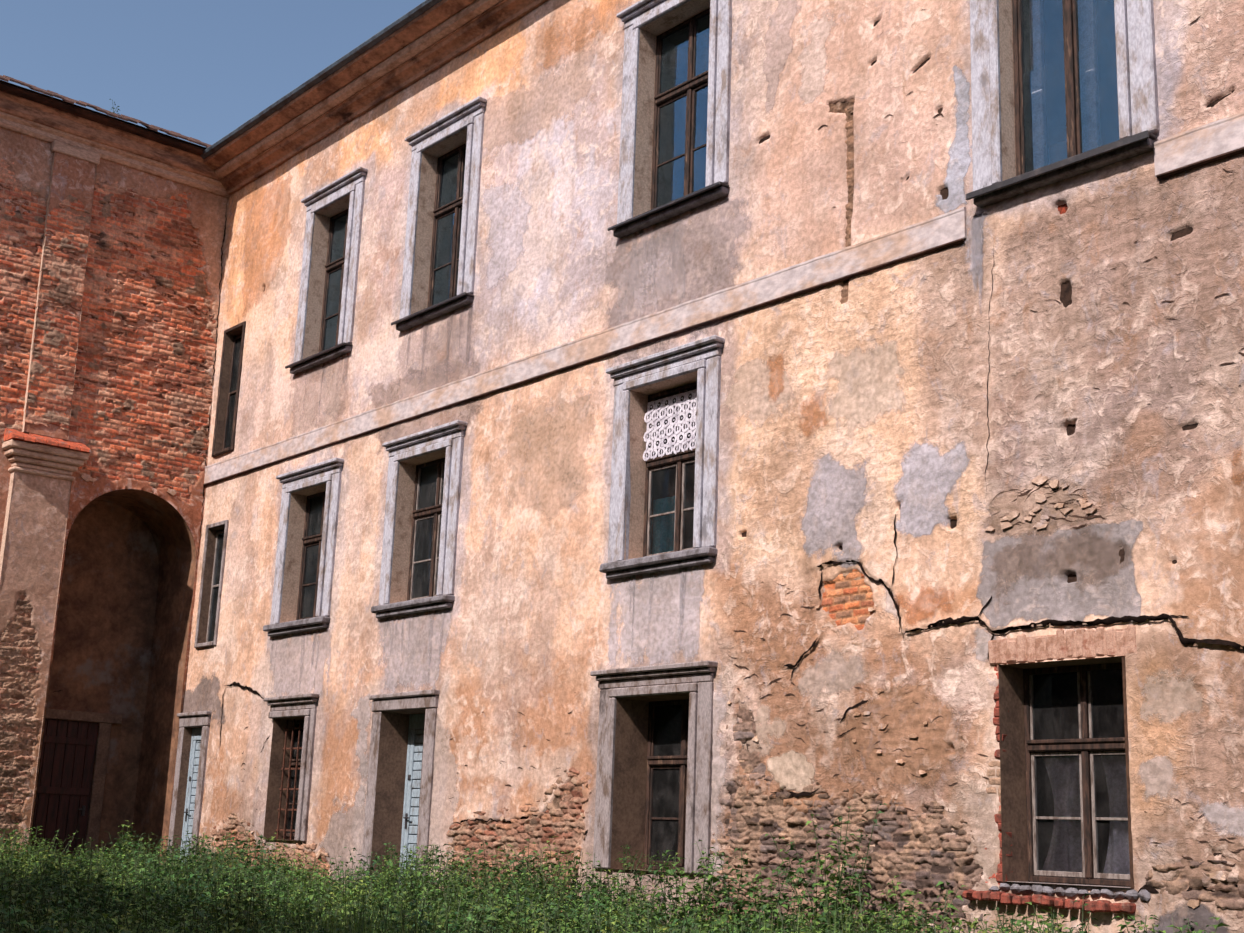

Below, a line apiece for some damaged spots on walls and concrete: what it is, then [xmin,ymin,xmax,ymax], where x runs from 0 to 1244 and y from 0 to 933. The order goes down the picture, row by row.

flaking render [984,474,1108,537]
crack [817,514,1244,660]
crack [219,682,264,751]
crack [784,639,817,684]
flaking render [707,442,1002,933]
flaking render [444,767,591,919]
flaking render [1139,756,1244,919]